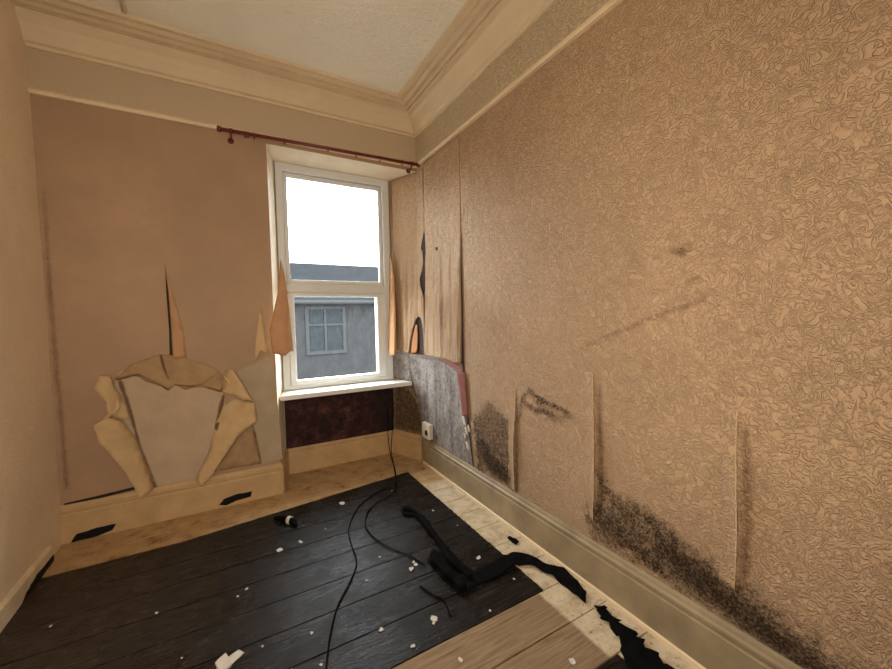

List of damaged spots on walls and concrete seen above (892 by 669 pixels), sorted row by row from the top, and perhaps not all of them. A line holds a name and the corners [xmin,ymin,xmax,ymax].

flaking render [115,370,226,487]
flaking render [237,307,283,464]
flaking render [394,352,472,465]
leakage [474,404,517,485]
leakage [589,474,835,669]